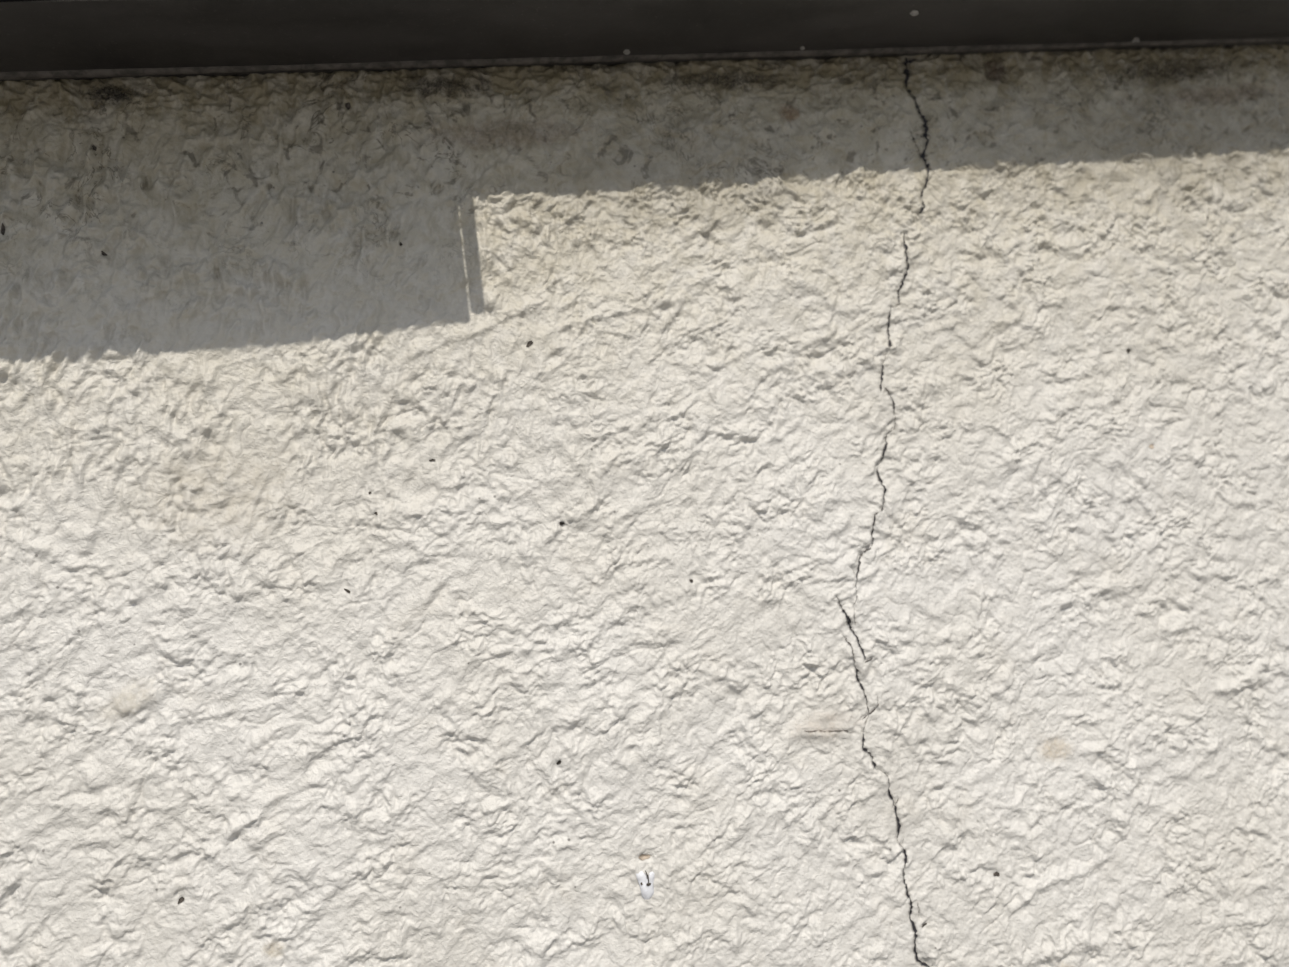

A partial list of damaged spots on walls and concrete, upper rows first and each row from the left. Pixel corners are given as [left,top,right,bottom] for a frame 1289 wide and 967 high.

crack [803,58,937,967]